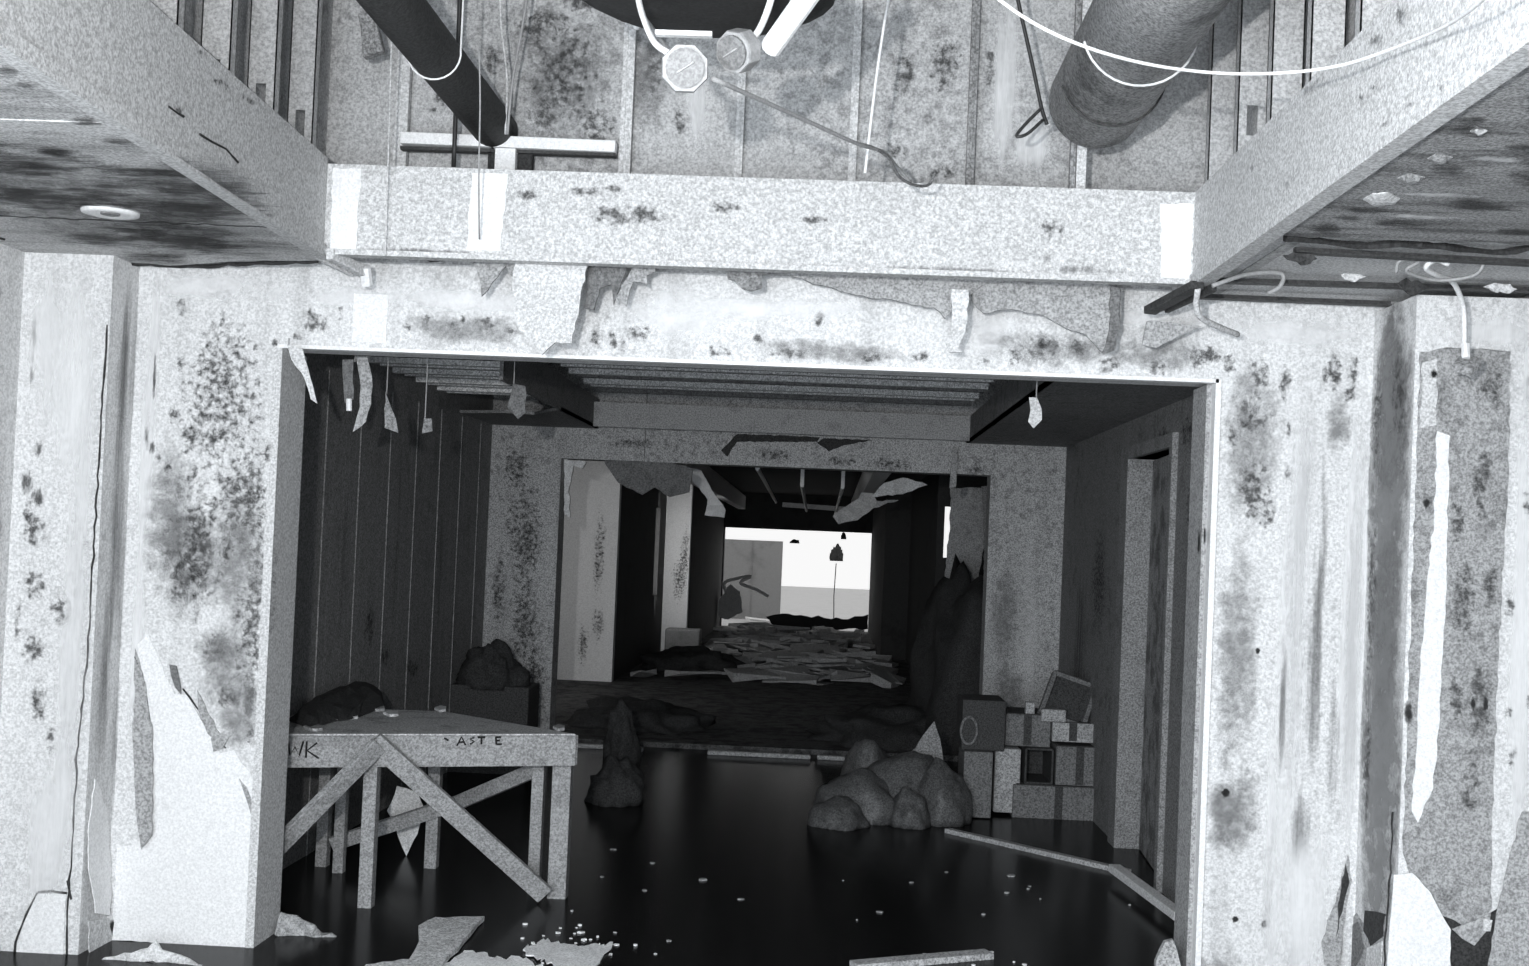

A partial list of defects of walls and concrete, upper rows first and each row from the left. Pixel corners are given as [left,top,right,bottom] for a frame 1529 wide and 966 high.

water stain [0,148,275,263]
water stain [22,476,45,545]
water stain [145,308,341,740]
water stain [15,629,41,659]
crack [13,325,108,955]
peeling [1411,359,1450,822]
water stain [32,691,53,740]
peeling [87,634,253,966]
spalling [1321,855,1497,966]